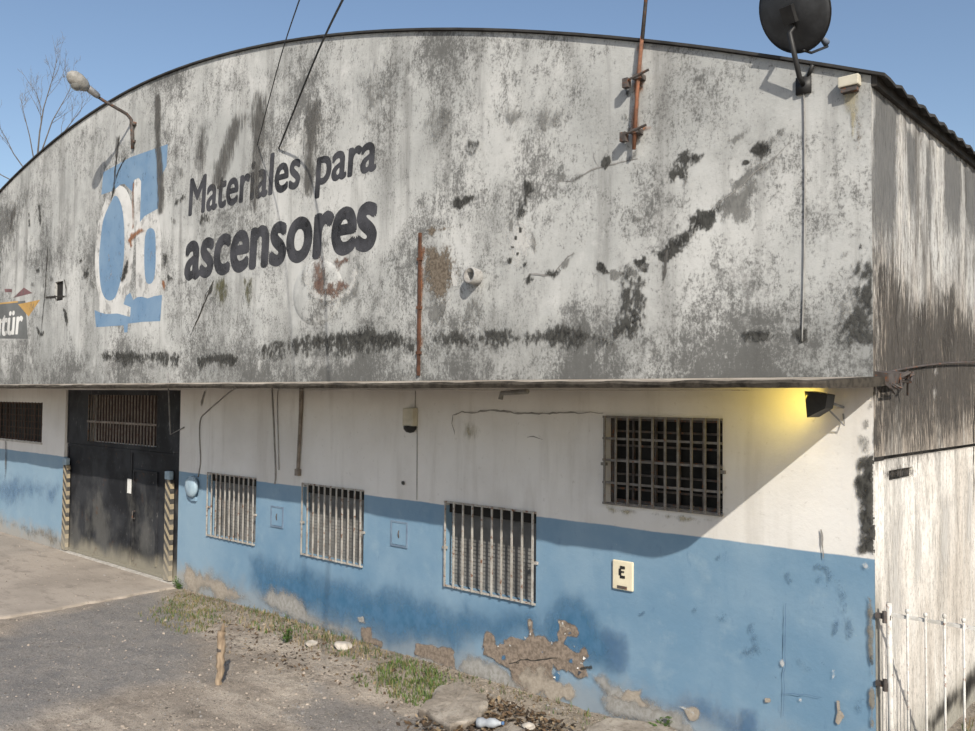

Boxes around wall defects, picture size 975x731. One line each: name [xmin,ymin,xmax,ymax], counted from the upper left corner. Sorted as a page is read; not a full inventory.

damp [154,94,185,224]
damp [196,129,207,168]
damp [212,93,266,210]
damp [303,99,321,195]
damp [428,130,783,350]
damp [102,349,181,368]
damp [197,353,238,370]
damp [261,325,414,359]
damp [792,327,807,343]
damp [839,90,975,554]
peeling [414,619,700,731]
peeling [835,701,844,725]